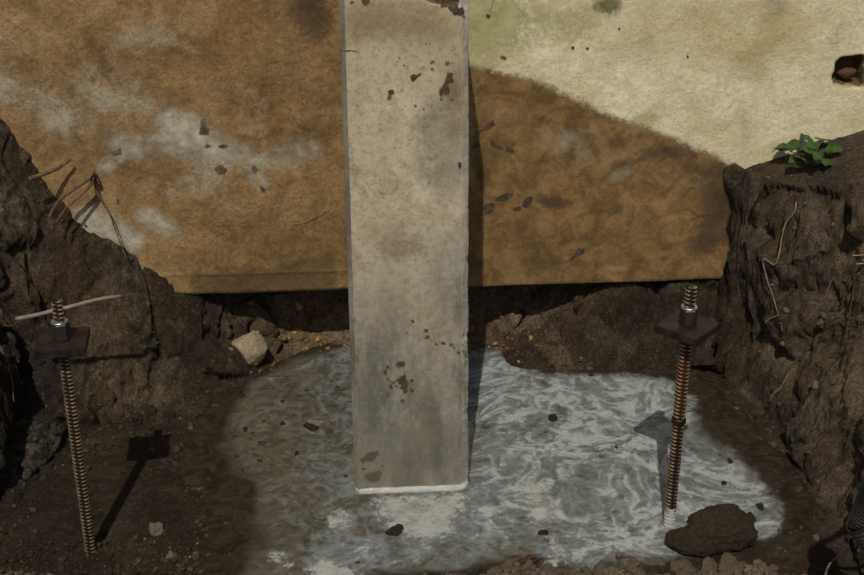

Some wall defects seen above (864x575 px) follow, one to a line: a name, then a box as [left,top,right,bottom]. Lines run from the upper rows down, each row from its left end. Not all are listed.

spalling [427,0,461,8]
water stain [115,112,240,157]
water stain [482,193,572,214]
water stain [690,162,732,249]
water stain [75,207,141,250]